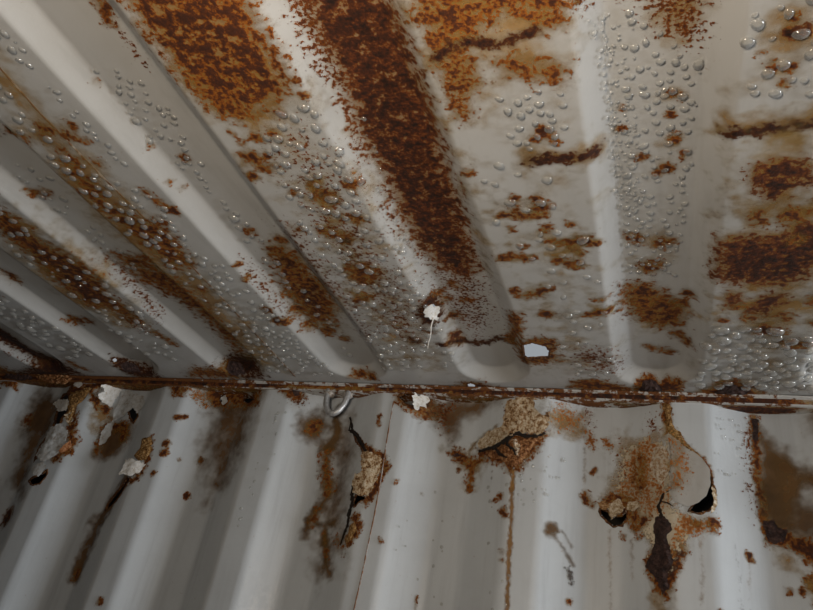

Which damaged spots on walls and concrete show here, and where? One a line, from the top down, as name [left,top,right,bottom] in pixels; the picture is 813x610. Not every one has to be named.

corrosion [116,0,312,184]
corrosion [615,0,721,56]
corrosion [716,110,813,140]
corrosion [752,8,813,88]
corrosion [231,0,625,374]
peeling [28,382,156,486]
peeling [345,442,392,548]
corrosion [491,467,515,610]
peeling [475,397,551,474]
peeling [597,498,640,520]
corrosion [549,402,722,610]
peeling [660,402,718,515]